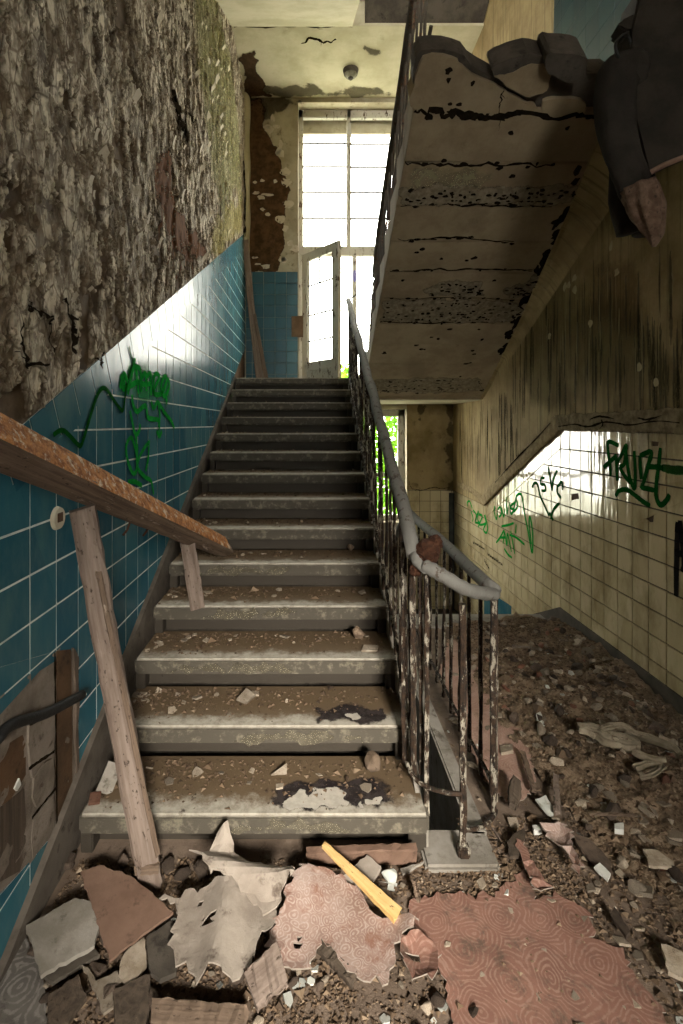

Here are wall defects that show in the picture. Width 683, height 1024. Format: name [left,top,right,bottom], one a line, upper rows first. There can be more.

crack [301,27,336,44]
spalling [486,38,543,76]
crack [414,87,594,131]
crack [405,161,555,169]
peeling [0,0,299,549]
spalling [423,206,570,355]
water stain [443,246,683,492]
peeling [231,786,382,835]